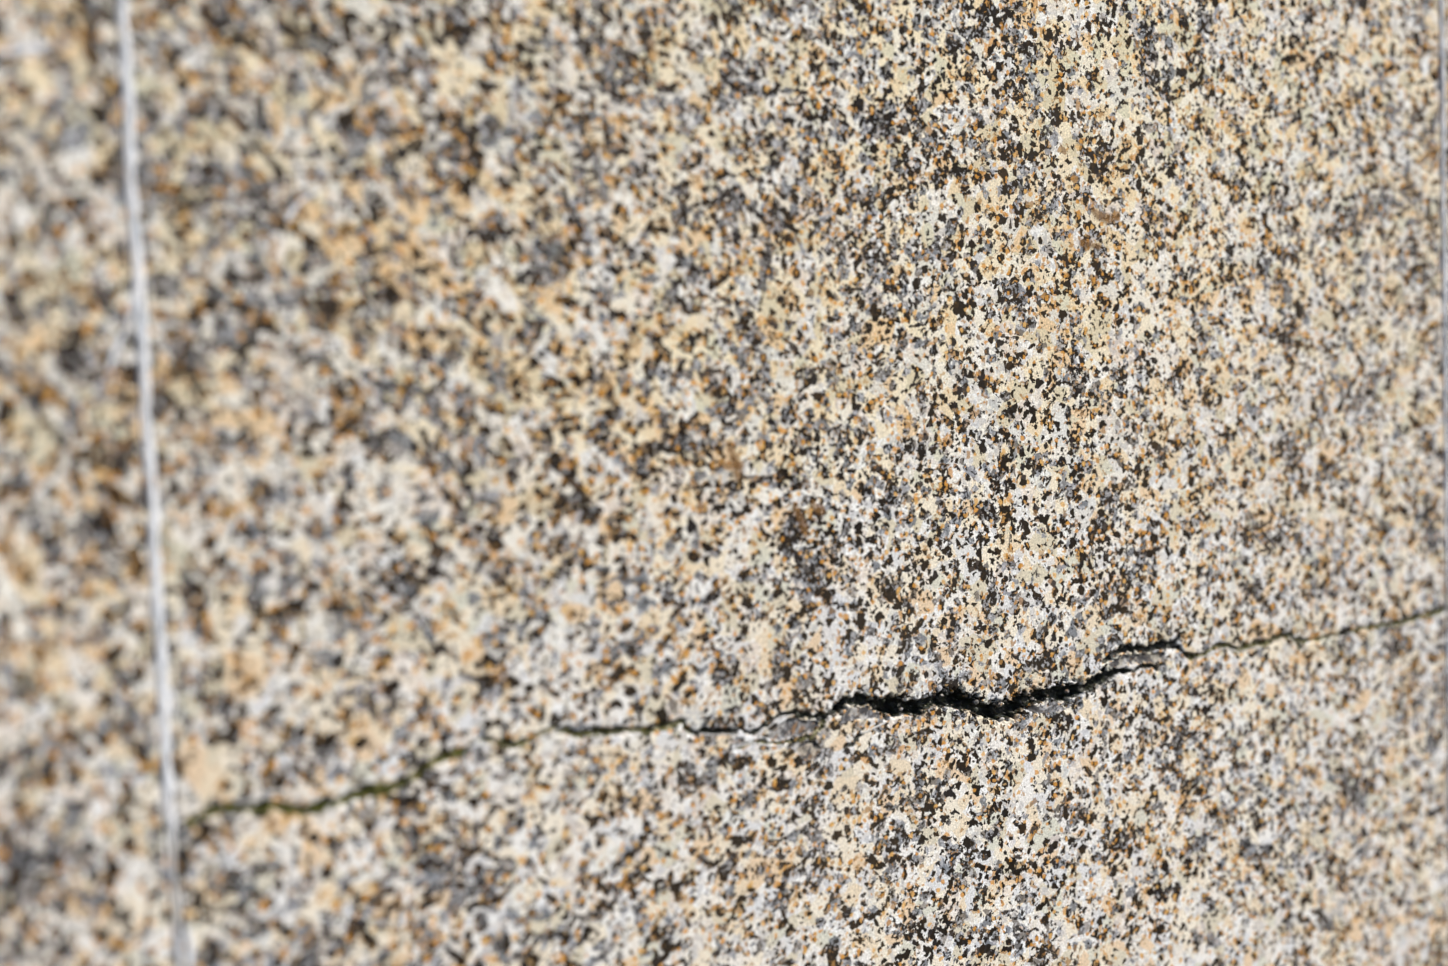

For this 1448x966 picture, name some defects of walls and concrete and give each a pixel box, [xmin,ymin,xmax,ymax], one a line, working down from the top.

crack [186,606,1445,825]